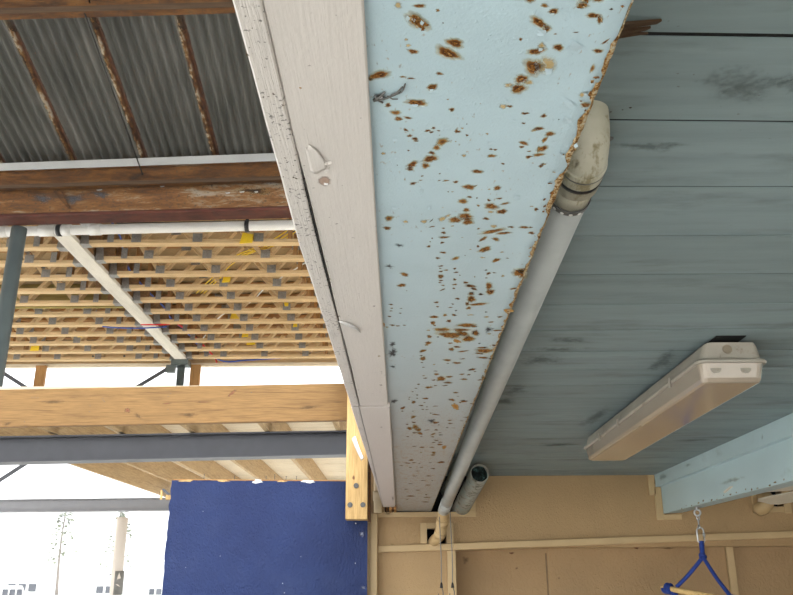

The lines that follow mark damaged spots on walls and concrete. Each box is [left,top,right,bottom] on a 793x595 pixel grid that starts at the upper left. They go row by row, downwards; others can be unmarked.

corrosion [6,22,77,161]
corrosion [89,17,148,158]
corrosion [176,16,220,155]
corrosion [368,71,388,81]
corrosion [386,103,418,142]
corrosion [397,0,634,511]